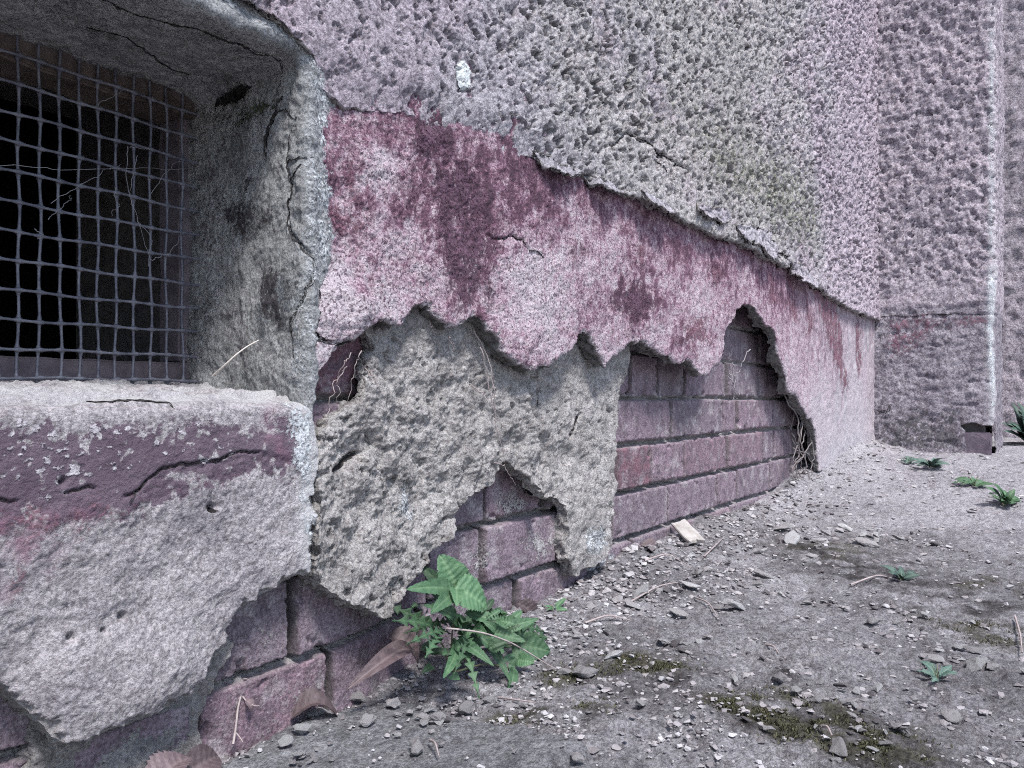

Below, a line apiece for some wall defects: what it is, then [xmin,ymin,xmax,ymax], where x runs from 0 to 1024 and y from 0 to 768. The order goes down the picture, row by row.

crack [87,0,351,358]
water stain [406,119,499,316]
crack [487,235,545,258]
peeling [533,150,626,195]
peeling [641,188,675,215]
peeling [696,202,821,289]
water stain [789,277,862,392]
crack [86,399,174,408]
crack [128,450,258,502]
spalling [0,306,808,768]